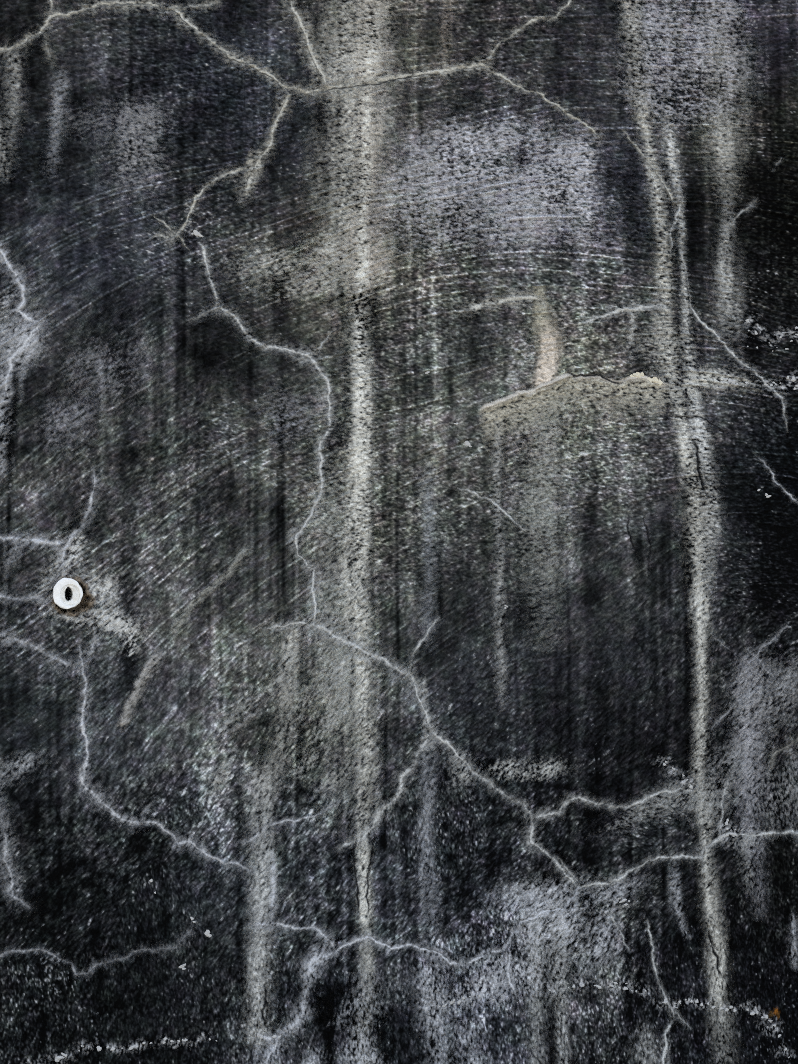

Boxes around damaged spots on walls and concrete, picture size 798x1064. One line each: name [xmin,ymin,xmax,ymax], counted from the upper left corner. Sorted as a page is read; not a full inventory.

crack [0,0,596,241]
damp [402,125,600,240]
crack [628,137,687,273]
crack [0,244,40,413]
damp [533,286,558,387]
crack [0,478,97,566]
damp [286,0,389,943]
damp [623,1,798,1058]
crack [0,633,331,869]
crack [202,246,798,1064]
damp [248,766,281,1045]
damp [421,885,646,1064]